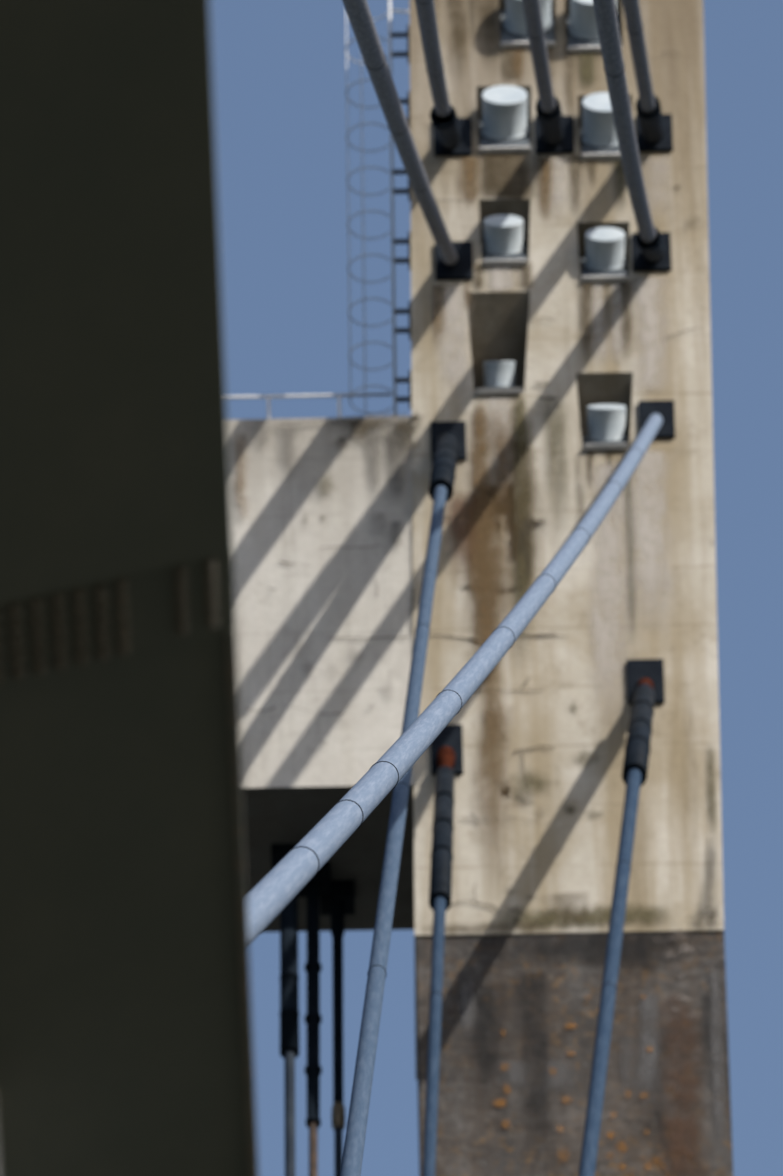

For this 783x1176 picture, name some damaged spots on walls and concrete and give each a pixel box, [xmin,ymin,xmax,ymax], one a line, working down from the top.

water stain [581,52,594,83]
water stain [491,265,513,289]
water stain [491,399,545,601]
water stain [511,907,611,950]
water stain [625,906,659,923]